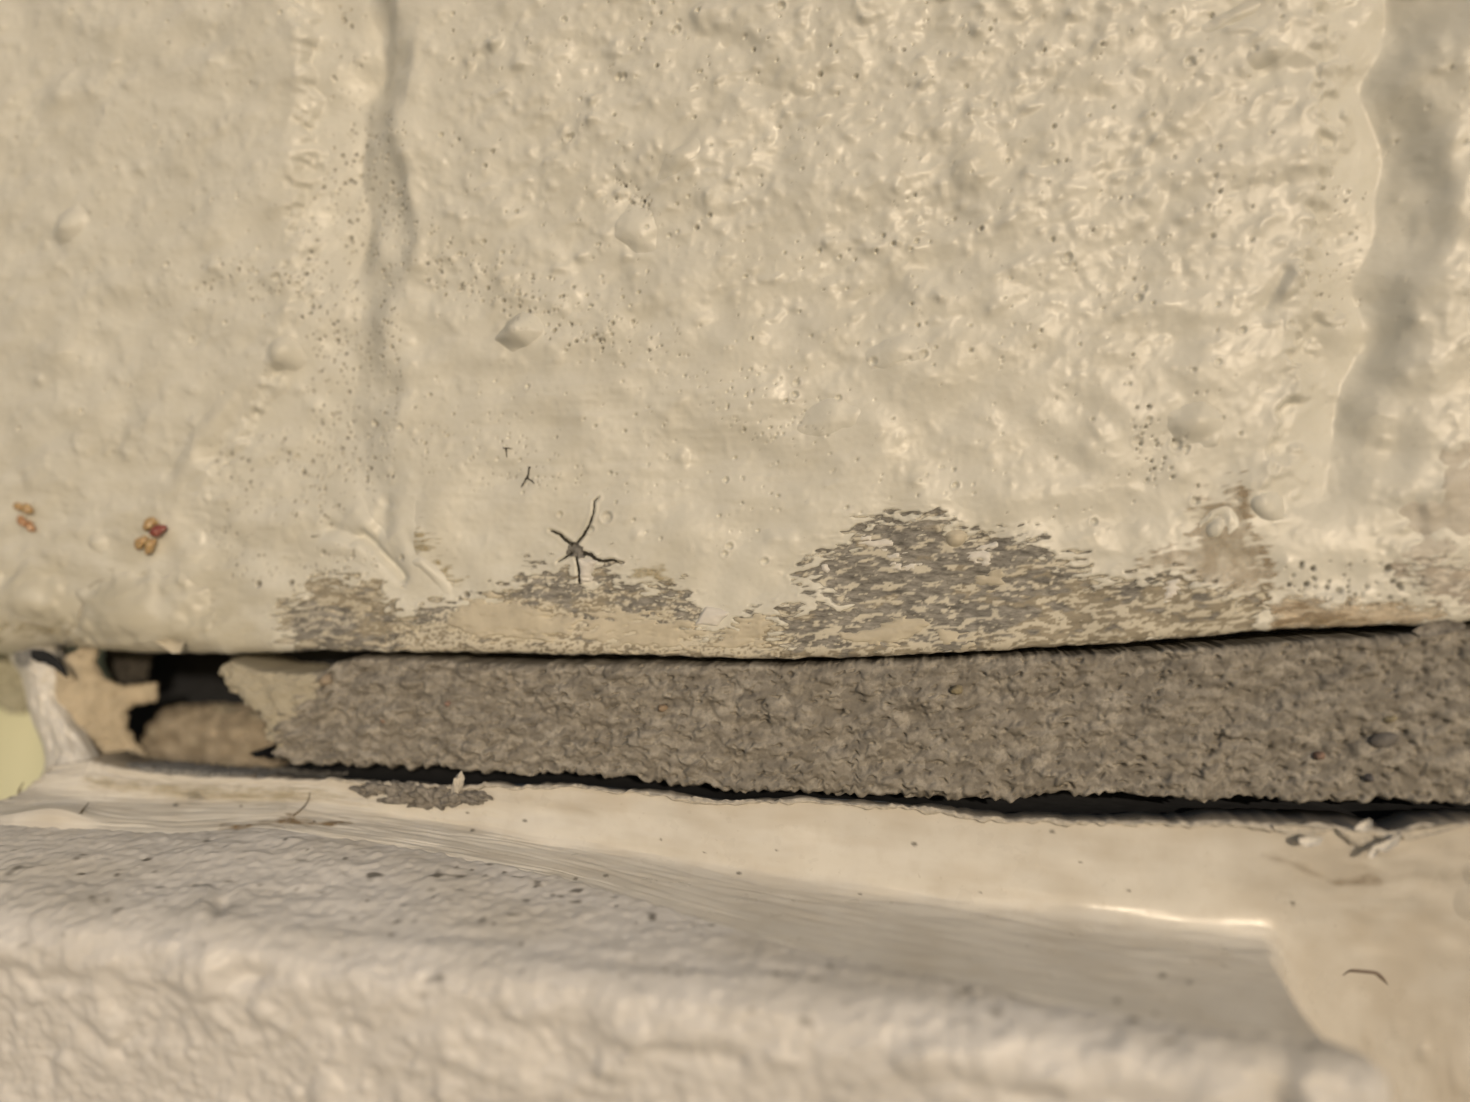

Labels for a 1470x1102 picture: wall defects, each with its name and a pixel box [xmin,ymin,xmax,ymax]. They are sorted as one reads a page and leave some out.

peeling [8,442,1470,779]
crack [1061,624,1385,647]
crack [277,649,381,666]
crack [451,650,682,658]
crack [250,744,1470,820]